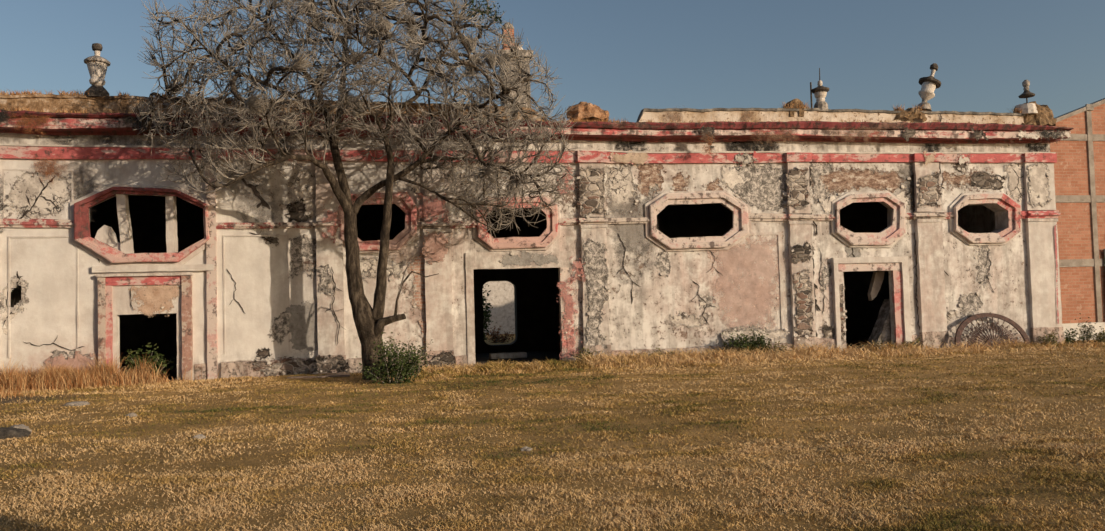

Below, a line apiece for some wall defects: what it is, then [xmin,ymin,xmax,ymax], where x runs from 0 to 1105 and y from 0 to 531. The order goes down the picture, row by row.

spalling [557,150,691,218]
spalling [703,151,1054,214]
peeling [128,284,181,316]
spalling [246,169,350,376]
spalling [669,293,716,328]
crack [690,250,723,323]
spalling [721,240,847,345]